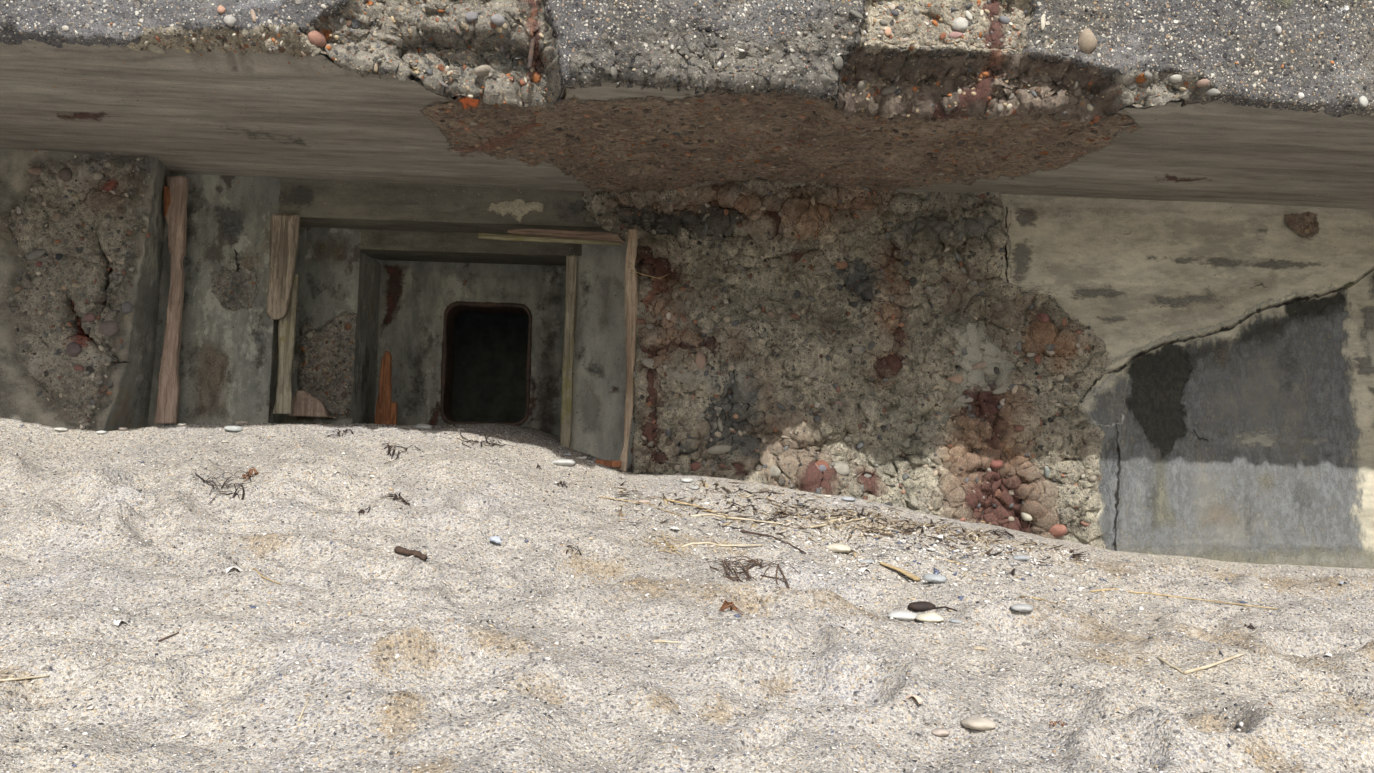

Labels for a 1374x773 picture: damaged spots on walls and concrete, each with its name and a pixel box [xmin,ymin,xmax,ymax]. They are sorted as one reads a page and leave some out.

crack [86,334,131,363]
spalling [0,0,1374,549]
leakage [1073,285,1122,299]
crack [1080,269,1374,403]
leakage [1148,256,1320,269]
rust [944,382,1054,538]
crack [1113,421,1121,551]
leakage [1083,277,1374,569]